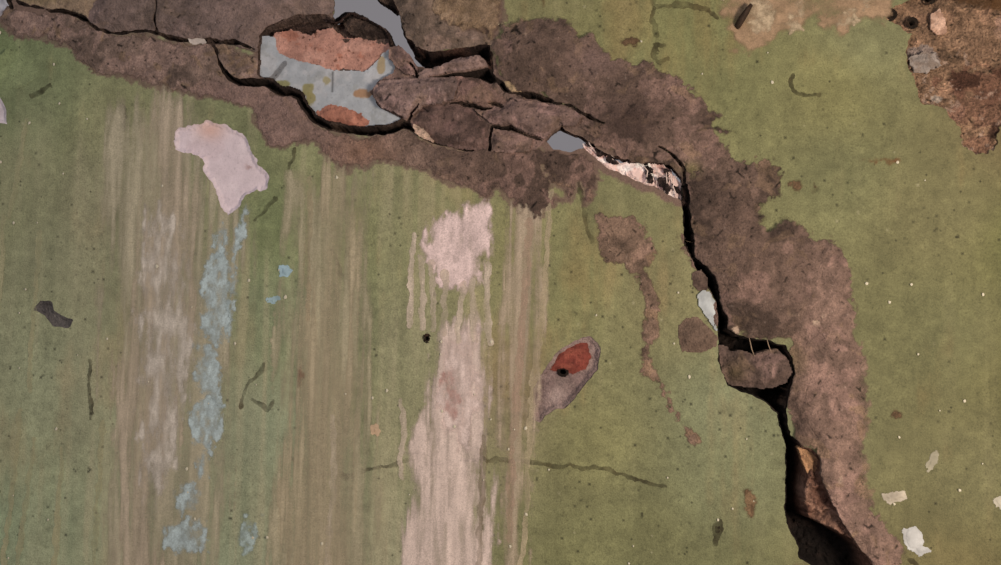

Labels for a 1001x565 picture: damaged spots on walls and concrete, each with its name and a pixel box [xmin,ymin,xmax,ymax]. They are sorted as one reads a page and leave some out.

crack [6,0,603,152]
spalling [0,0,688,219]
spalling [720,0,1001,155]
spalling [34,301,73,328]
leakage [95,89,245,565]
peeling [162,120,269,555]
leakage [397,201,552,565]
spalling [532,336,601,422]
spalling [595,212,702,446]
spalling [678,290,718,353]
crack [658,146,872,565]
peeling [882,491,907,505]